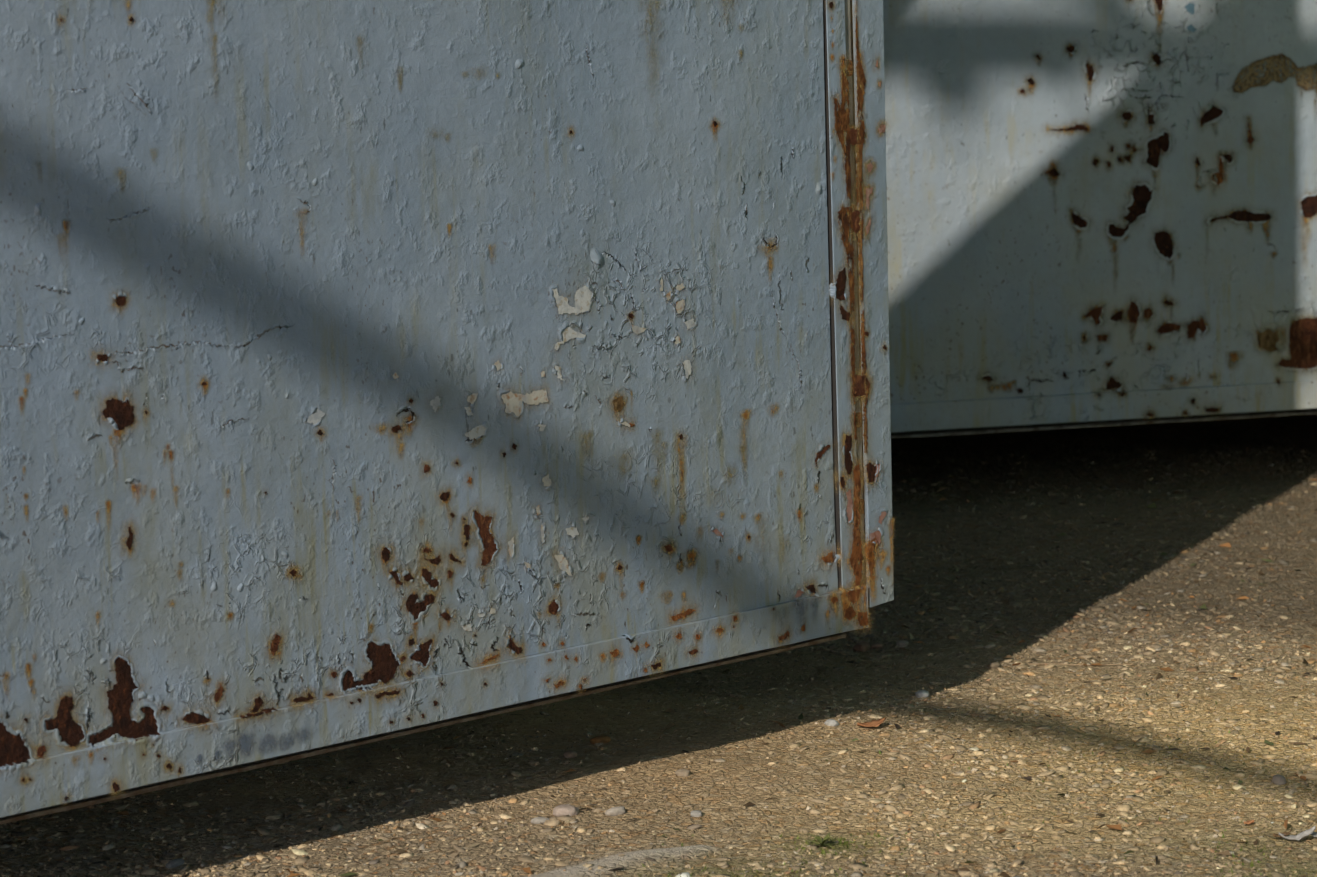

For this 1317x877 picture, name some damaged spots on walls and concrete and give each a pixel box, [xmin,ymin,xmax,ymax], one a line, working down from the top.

peeling [656,274,698,383]
corrosion [804,2,894,629]
corrosion [1070,107,1172,277]
corrosion [1151,230,1180,272]
corrosion [1256,317,1317,385]
corrosion [101,395,149,445]
corrosion [236,489,500,720]
corrosion [0,654,225,783]